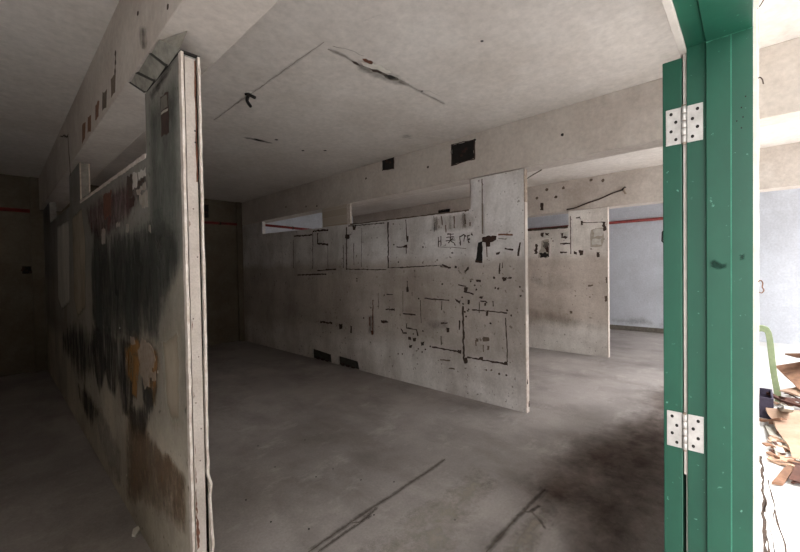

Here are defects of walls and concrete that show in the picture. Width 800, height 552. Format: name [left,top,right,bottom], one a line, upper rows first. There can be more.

damp [63,89,185,528]
peeling [130,336,158,389]
crack [308,459,445,552]
crack [486,489,546,552]